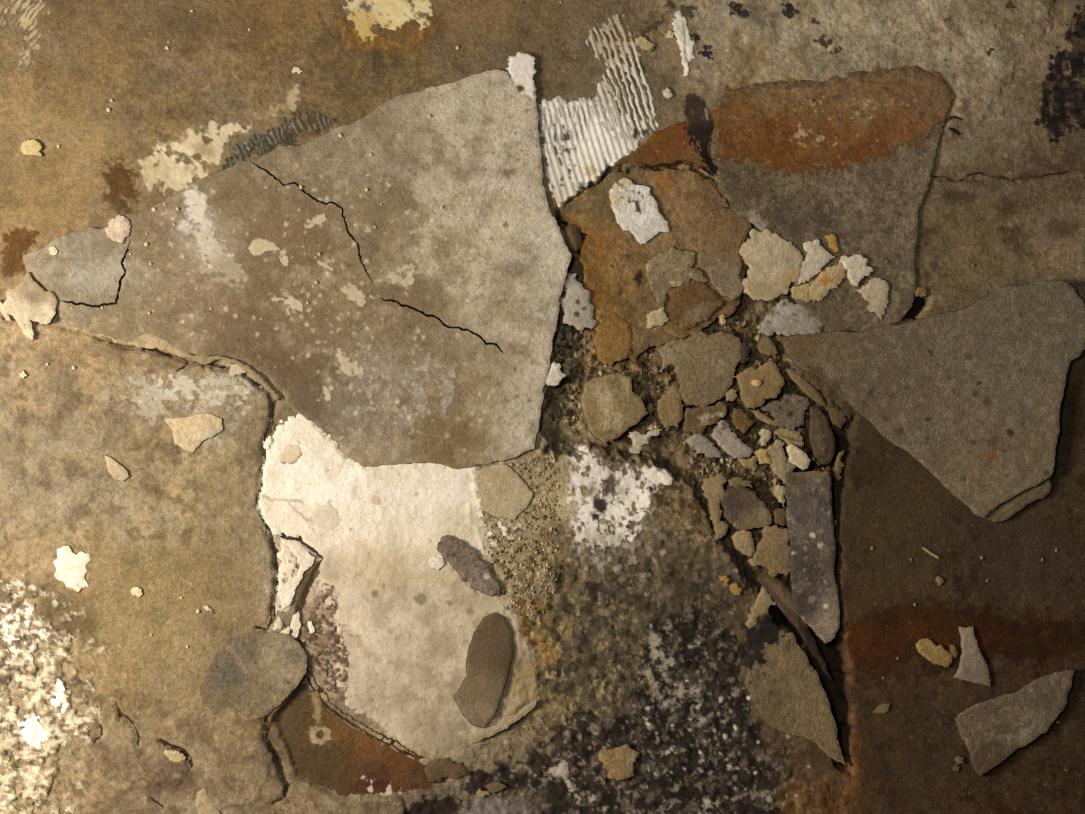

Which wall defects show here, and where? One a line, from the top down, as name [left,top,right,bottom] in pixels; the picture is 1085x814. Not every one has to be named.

spalling [662,87,718,175]
rust [711,66,954,178]
crack [249,159,505,354]
peeling [646,306,669,329]
flaking render [546,362,568,386]
flaking render [628,429,661,454]
flaking render [685,434,721,459]
peeling [770,484,785,508]
flaking render [256,414,539,757]
peeling [718,575,742,596]
damp [477,445,790,814]
rust [845,596,1085,682]